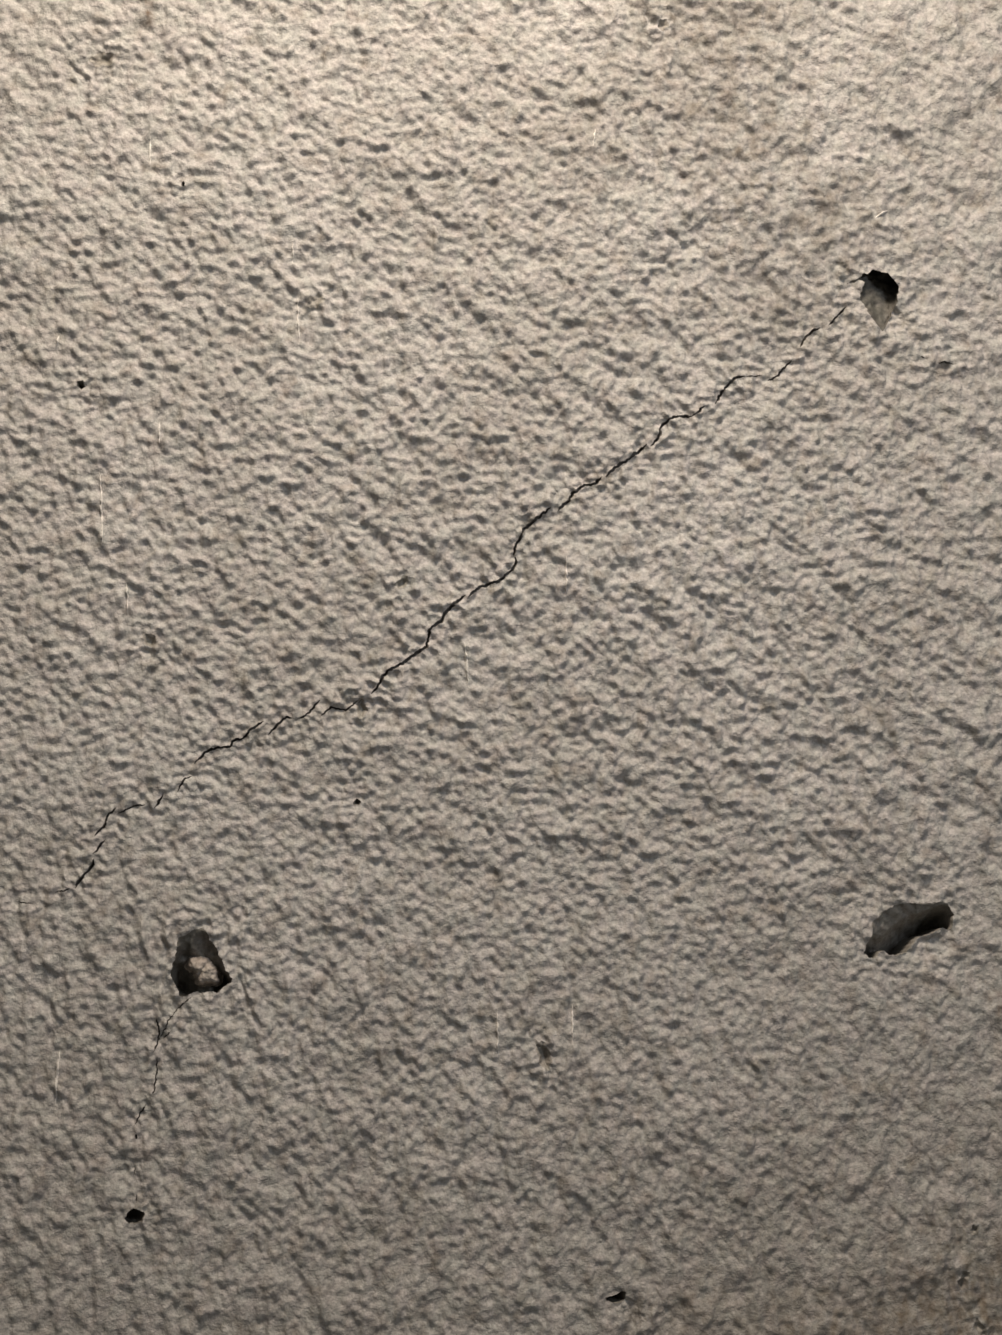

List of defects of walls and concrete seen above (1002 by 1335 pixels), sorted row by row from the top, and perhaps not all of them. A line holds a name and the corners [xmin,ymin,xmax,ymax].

spalling [847,269,899,331]
crack [17,307,846,905]
spalling [170,928,233,997]
spalling [864,901,954,958]